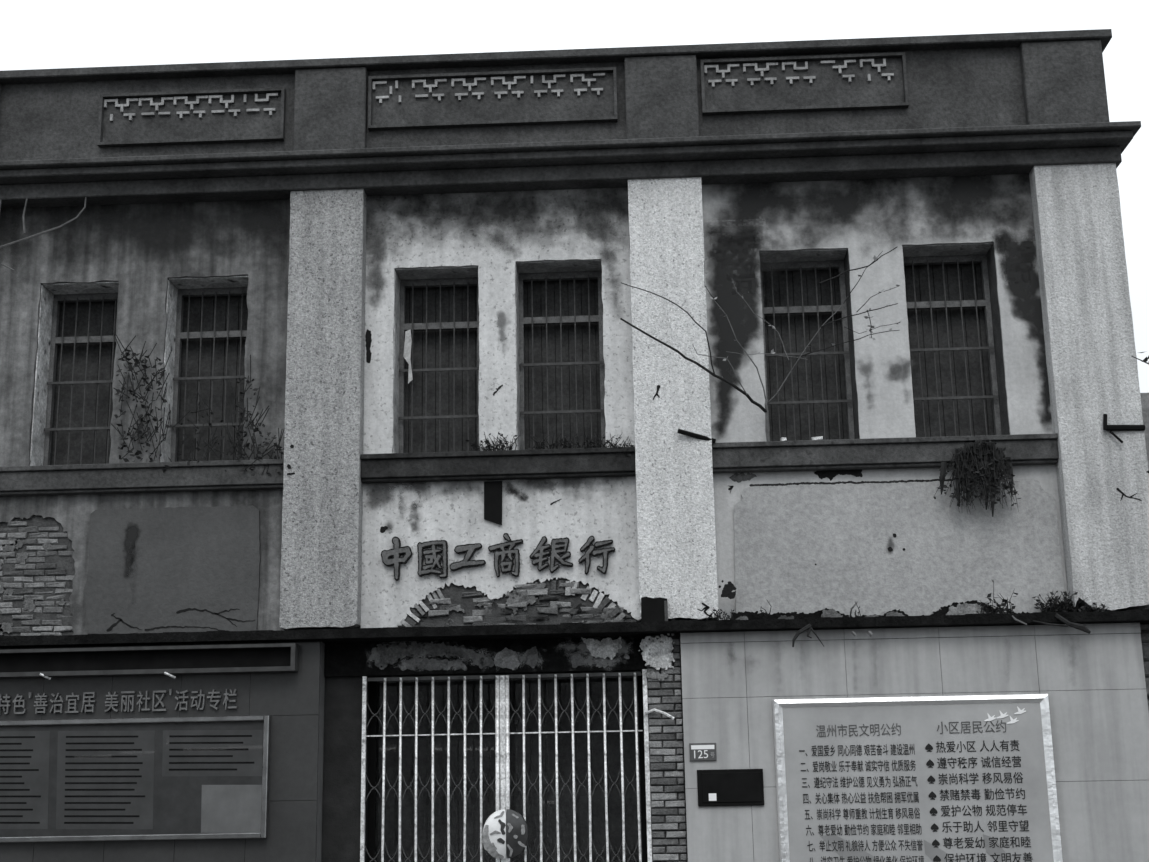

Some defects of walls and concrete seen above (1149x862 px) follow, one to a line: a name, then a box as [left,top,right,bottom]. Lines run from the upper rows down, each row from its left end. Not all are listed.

damp [366,187,629,303]
damp [707,174,1052,435]
flaking render [0,521,74,636]
flaking render [371,641,538,671]
flaking render [400,580,635,627]
flaking render [570,619,698,681]